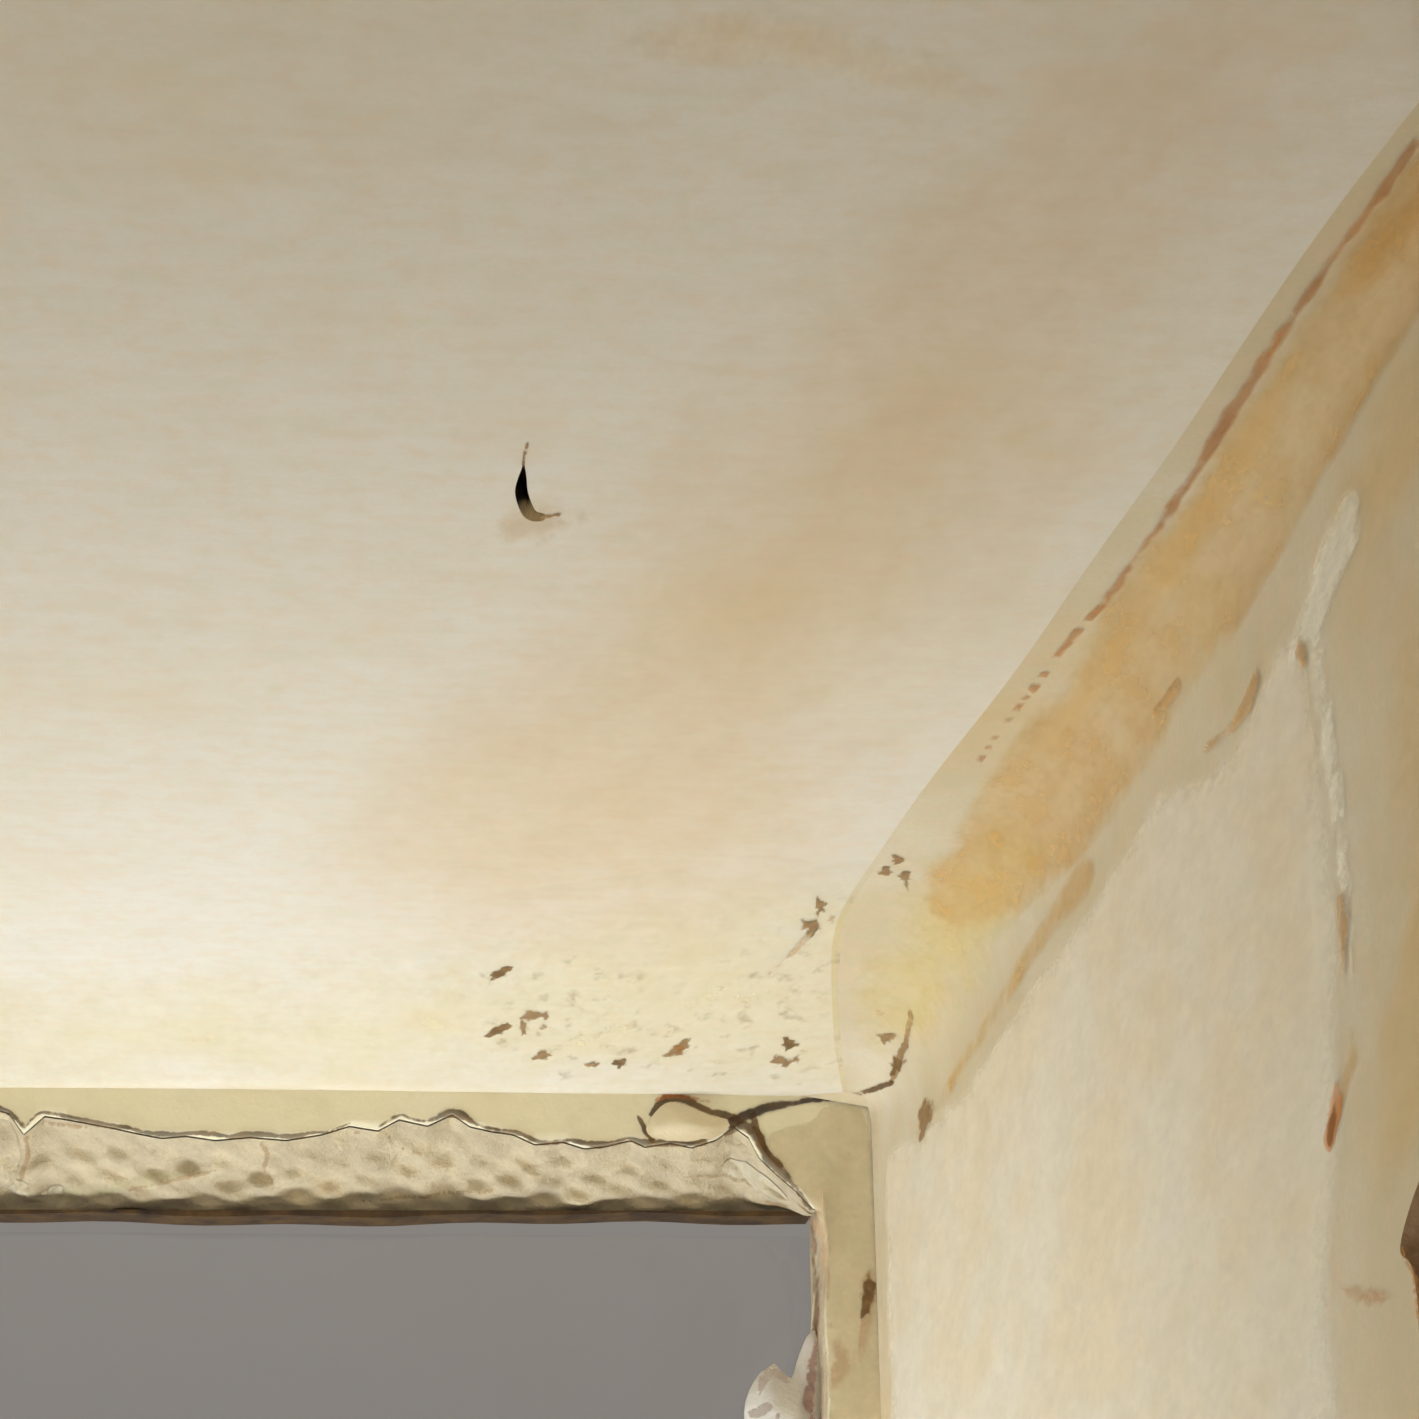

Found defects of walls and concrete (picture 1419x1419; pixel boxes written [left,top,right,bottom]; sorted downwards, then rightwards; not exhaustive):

peeling [802,896,827,934]
peeling [490,967,512,980]
peeling [484,1011,548,1038]
peeling [584,1059,626,1069]
peeling [663,1039,690,1057]
peeling [771,1037,799,1067]
crack [728,1081,893,1168]
spalling [0,1094,816,1216]
spalling [744,1330,821,1419]